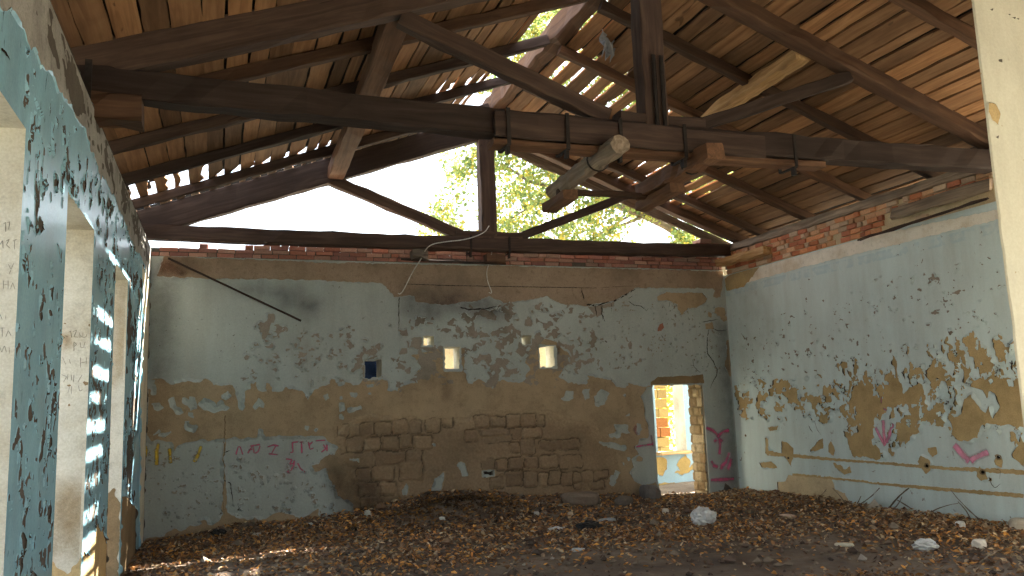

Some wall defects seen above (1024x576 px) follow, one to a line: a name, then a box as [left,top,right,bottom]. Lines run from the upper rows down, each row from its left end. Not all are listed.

spalling [987,102,1001,139]
flaking render [0,0,727,576]
crack [691,319,726,385]
peeling [724,256,1024,502]